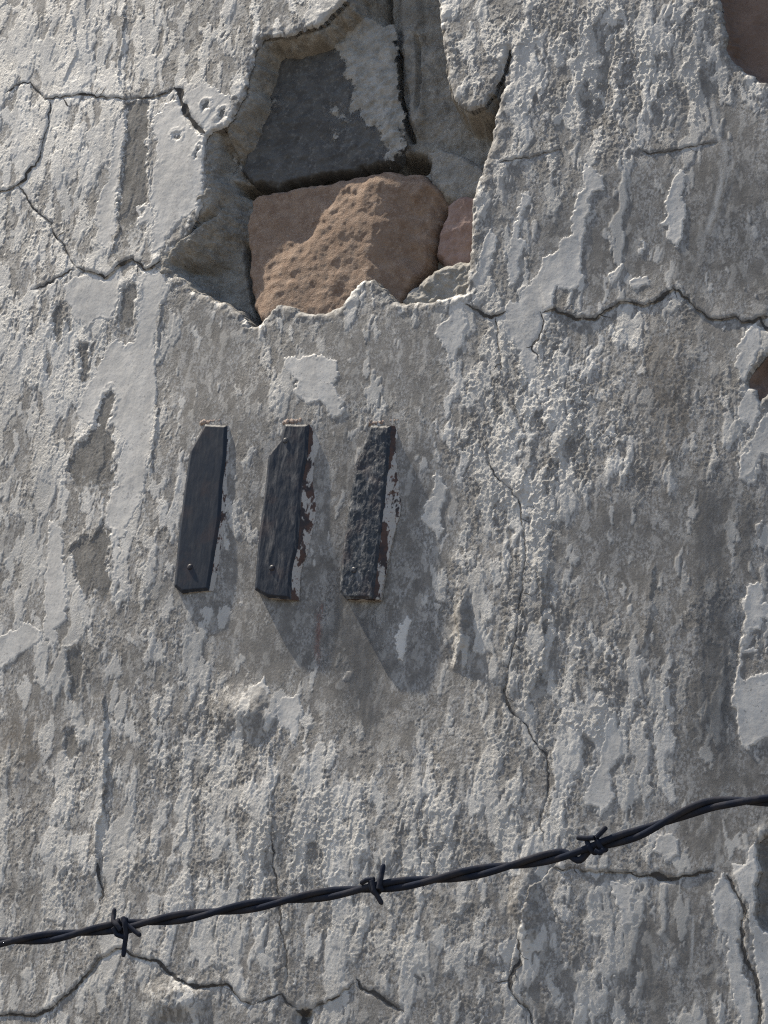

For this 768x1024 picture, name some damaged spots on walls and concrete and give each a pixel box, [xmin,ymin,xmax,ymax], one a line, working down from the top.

spalling [720,0,768,84]
crack [0,82,205,293]
spalling [0,0,605,704]
crack [527,288,768,359]
crack [487,461,550,843]
peeling [64,730,80,759]
crack [0,841,405,1024]
crack [498,938,533,1024]
crack [552,864,762,1024]